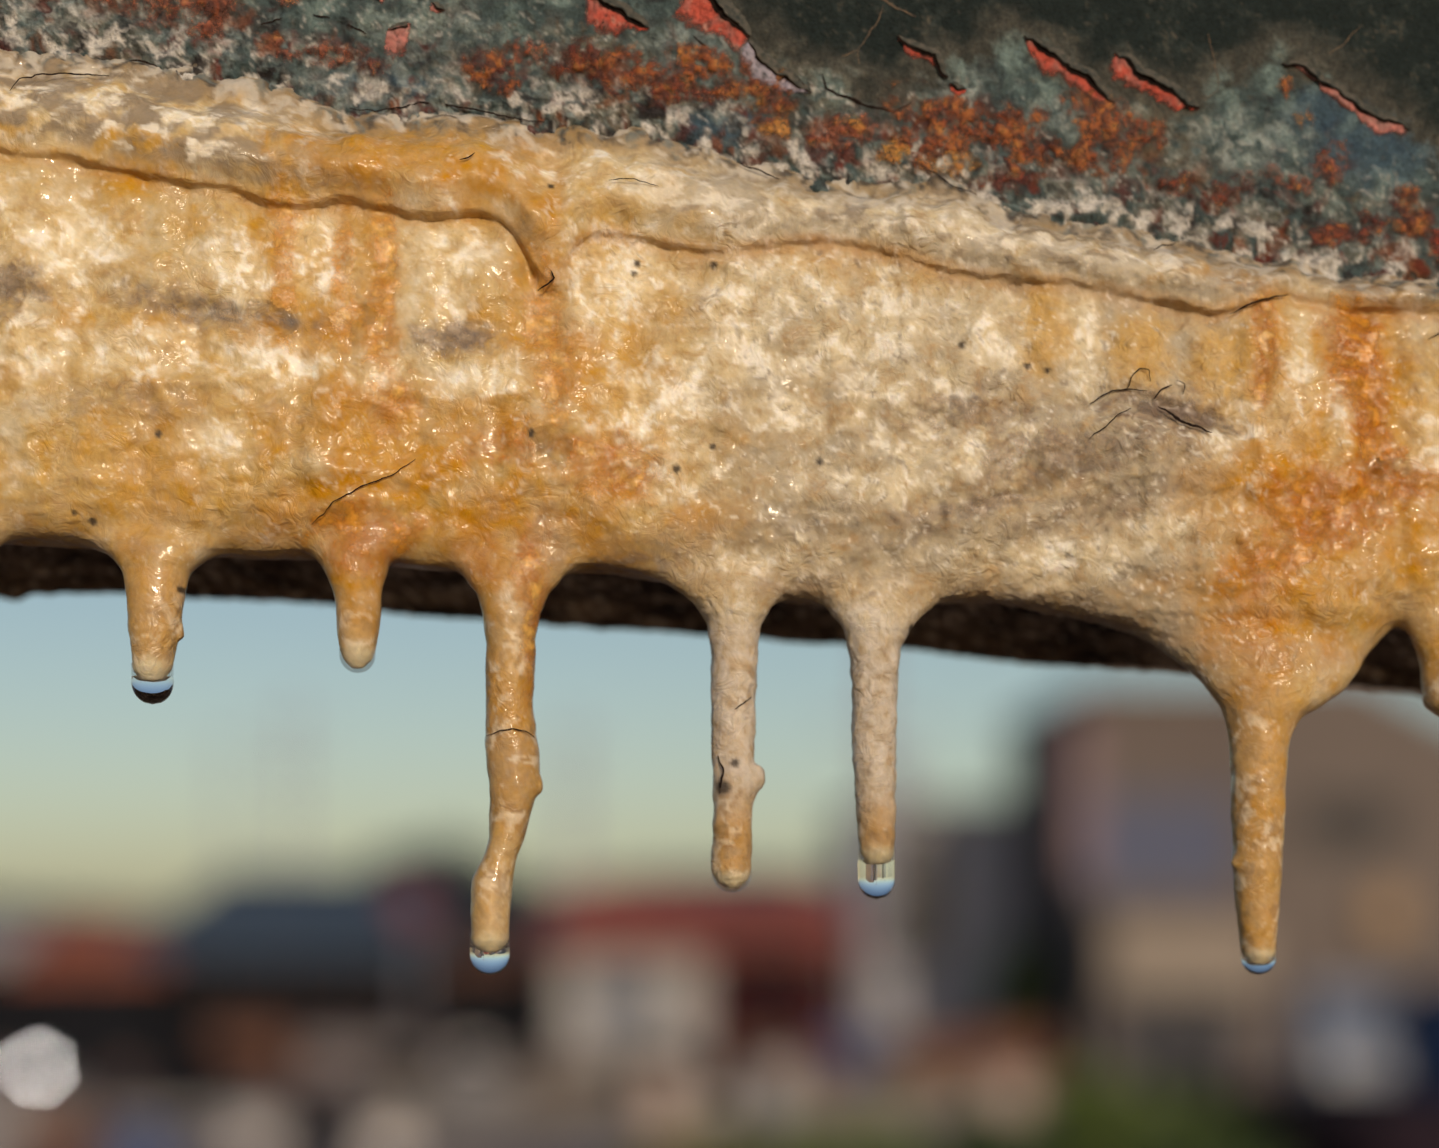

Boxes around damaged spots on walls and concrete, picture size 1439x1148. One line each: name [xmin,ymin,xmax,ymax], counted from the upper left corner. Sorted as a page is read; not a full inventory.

rust [105,0,236,37]
rust [259,35,390,74]
rust [461,38,1168,193]
peeling [897,34,967,95]
peeling [1024,34,1200,111]
peeling [1281,60,1411,134]
rust [1159,170,1252,206]
rust [1272,142,1344,194]
rust [1309,185,1439,255]
rust [329,204,399,358]
rust [1243,293,1439,576]
damp [0,49,1439,960]